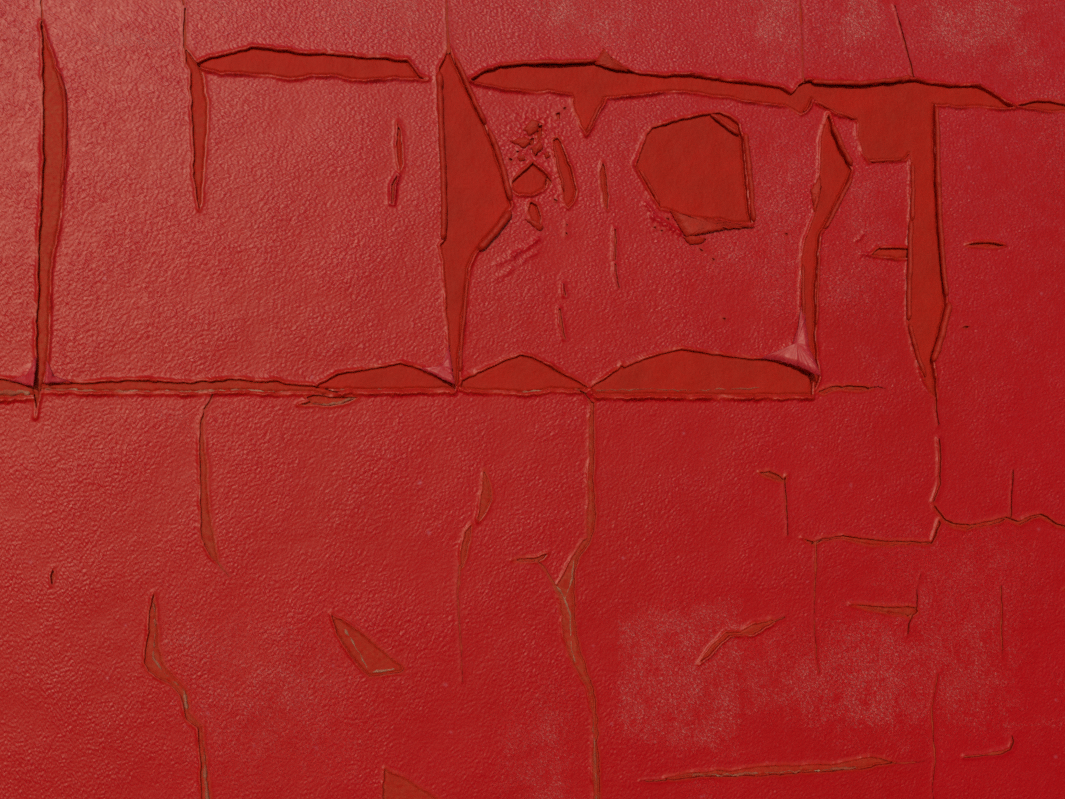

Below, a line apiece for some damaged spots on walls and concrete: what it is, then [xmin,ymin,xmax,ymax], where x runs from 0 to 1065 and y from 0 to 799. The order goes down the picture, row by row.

peeling [8,0,75,427]
peeling [176,0,1065,416]
crack [0,368,346,581]
crack [137,587,218,799]
crack [507,388,606,799]
crack [815,376,890,403]
crack [692,397,1065,677]